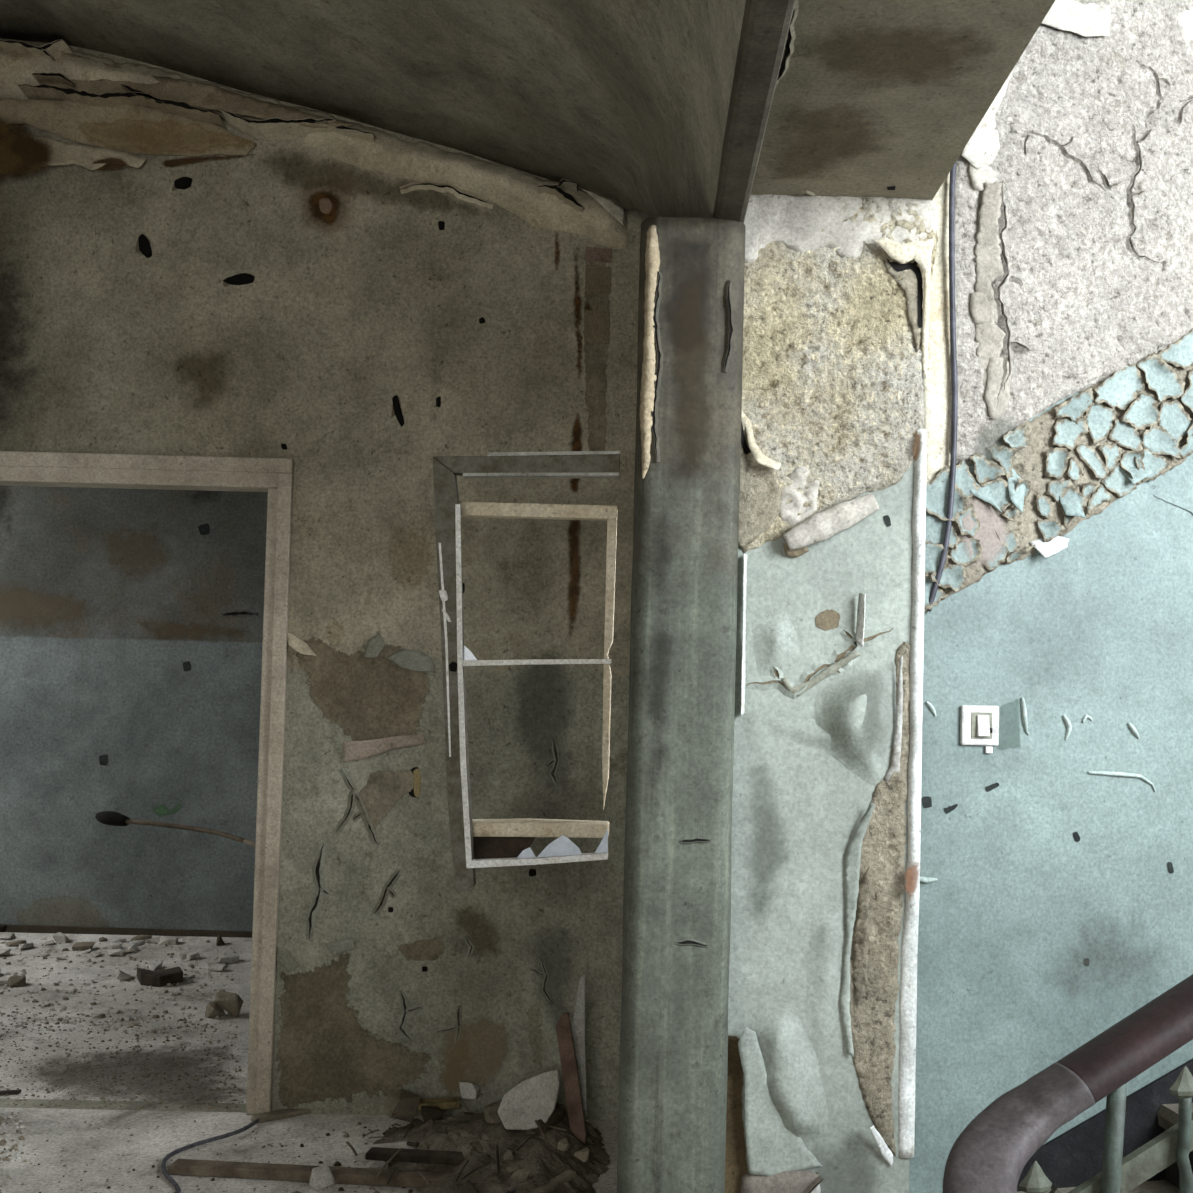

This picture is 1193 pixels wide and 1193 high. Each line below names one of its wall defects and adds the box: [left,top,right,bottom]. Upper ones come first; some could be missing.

crack [776,0,799,87]
water stain [0,119,49,179]
peeling [0,49,628,451]
rust [309,192,339,224]
crack [1012,57,1193,265]
rust [574,258,591,373]
peeling [640,225,660,479]
flaking render [738,0,1193,717]
rust [571,416,582,451]
crack [1154,495,1193,515]
rust [568,520,580,629]
spalling [724,1026,823,1193]